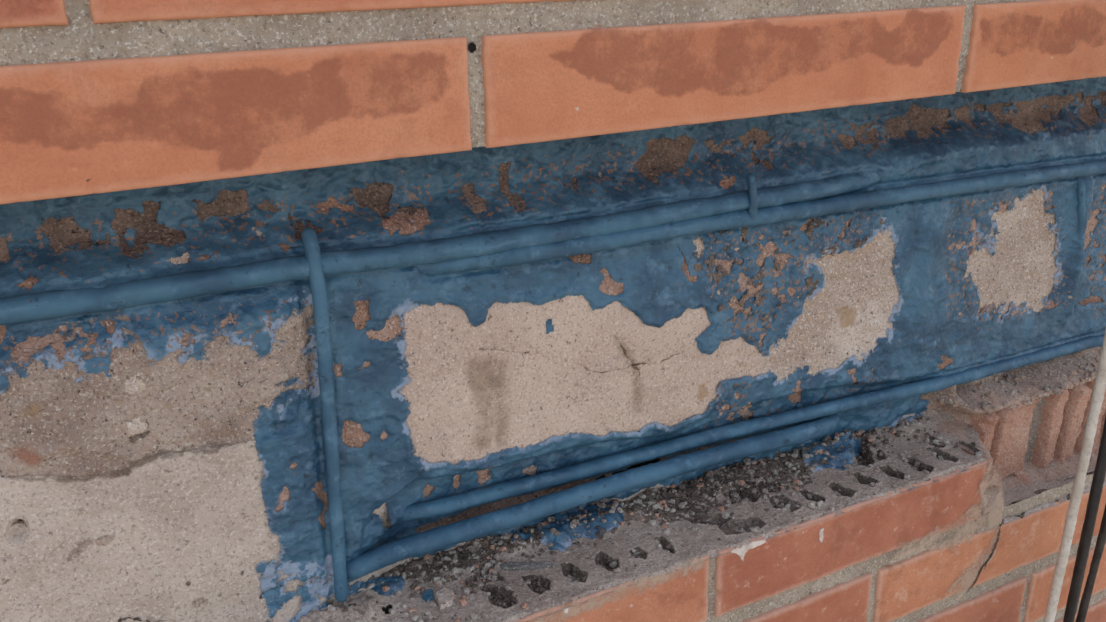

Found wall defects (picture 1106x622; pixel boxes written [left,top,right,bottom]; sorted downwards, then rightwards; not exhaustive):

spalling [0,189,322,479]
peeling [316,159,1106,580]
peeling [275,486,290,512]
peeling [311,481,328,530]
spalling [67,534,115,561]
crack [967,501,1025,592]
crack [118,614,165,622]